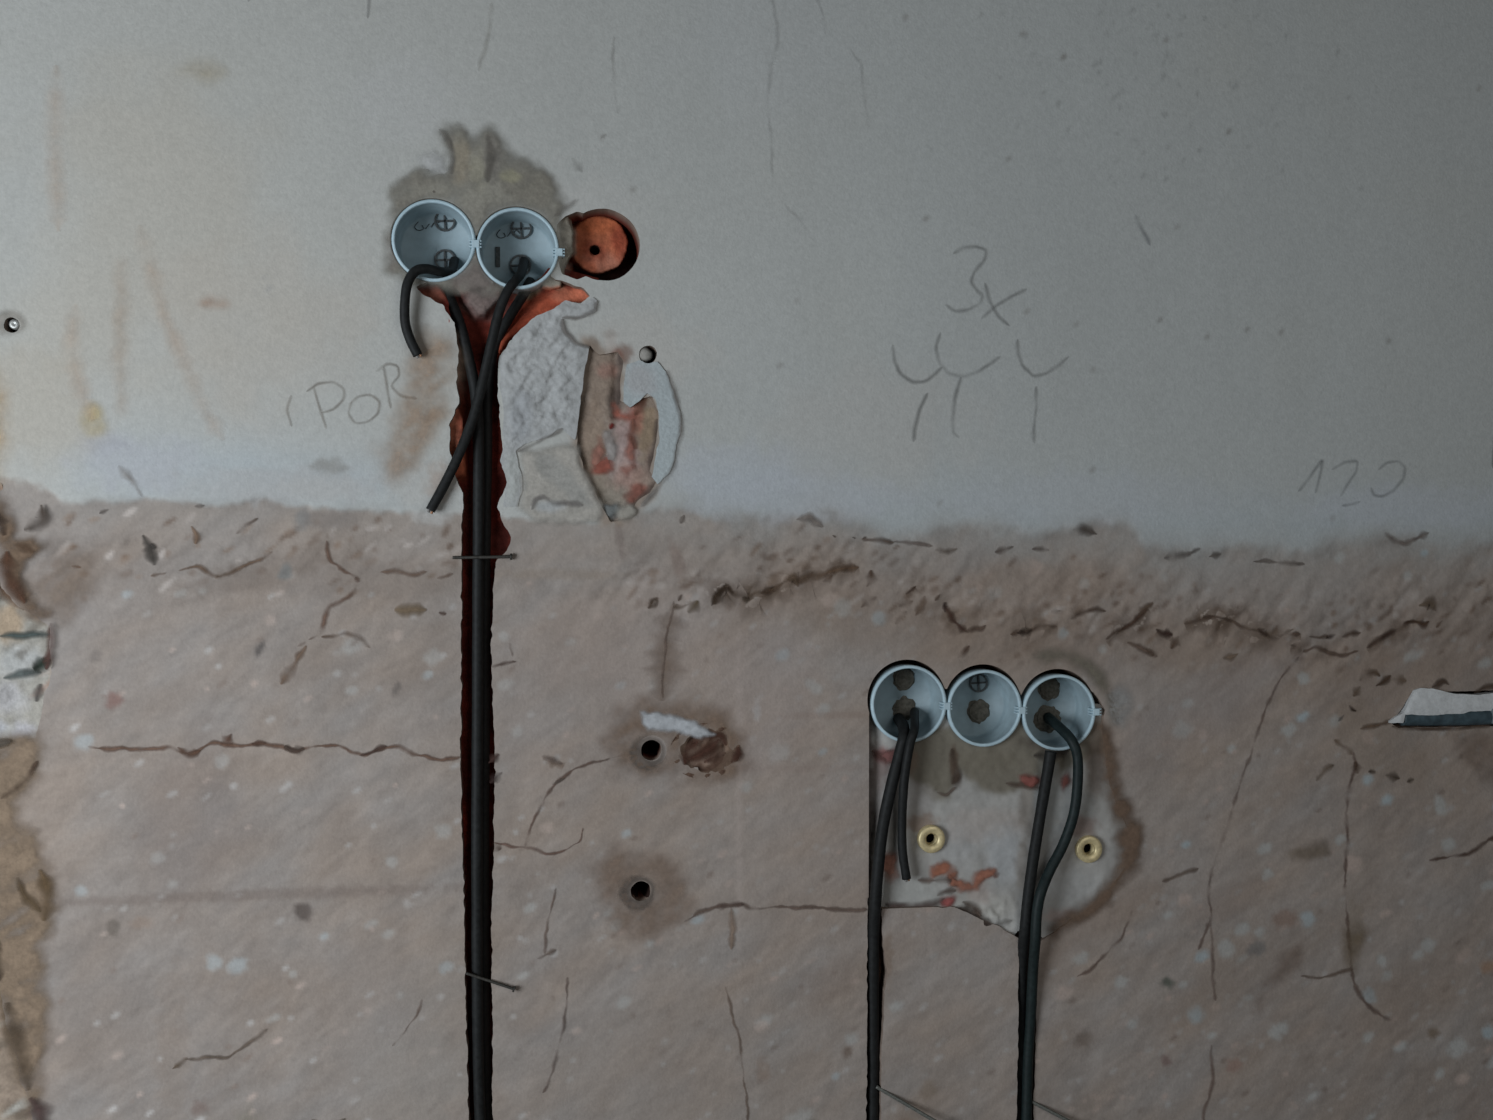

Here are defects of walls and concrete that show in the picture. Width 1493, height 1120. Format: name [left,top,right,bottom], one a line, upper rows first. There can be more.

flaking render [577,347,658,522]
spalling [0,483,54,1120]
crack [97,735,499,783]
crack [495,758,607,855]
crack [1162,869,1198,882]
crack [1304,740,1411,1016]
crack [1433,837,1493,860]
crack [544,894,568,1030]
crack [693,903,867,949]
crack [1198,904,1216,999]
crack [1203,1063,1214,1120]